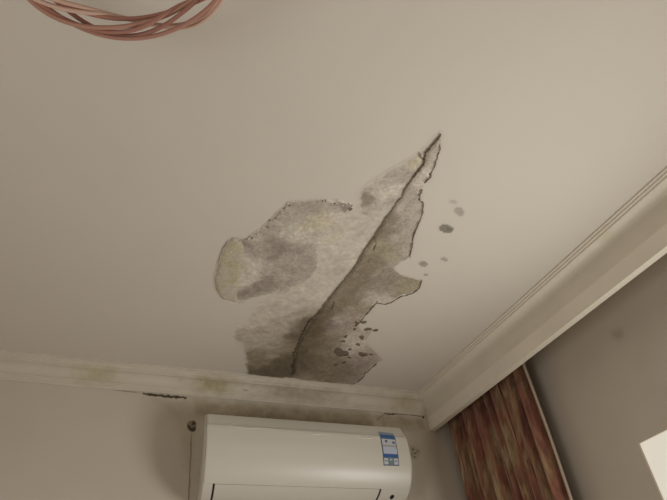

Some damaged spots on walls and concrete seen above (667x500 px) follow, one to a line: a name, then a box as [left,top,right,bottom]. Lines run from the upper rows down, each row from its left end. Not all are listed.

crack [117,390,187,399]
damp [143,187,438,500]
peeling [213,131,443,385]
crack [292,134,441,376]
damp [437,223,455,234]